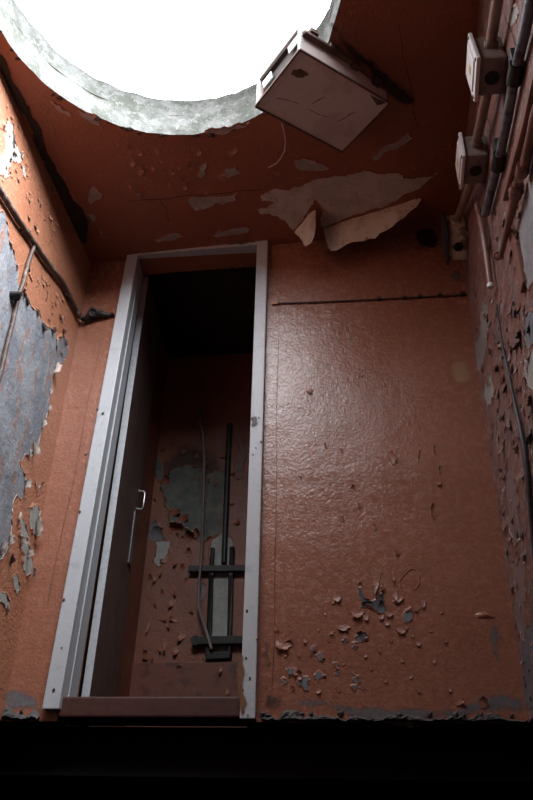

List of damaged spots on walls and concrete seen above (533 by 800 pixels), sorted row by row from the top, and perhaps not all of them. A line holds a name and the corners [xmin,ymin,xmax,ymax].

peeling [0,104,53,207]
peeling [187,191,239,212]
peeling [256,131,438,251]
peeling [509,177,533,293]
peeling [0,209,69,614]
peeling [473,288,533,492]
peeling [142,435,262,673]
spalling [1,706,40,721]
peeling [275,633,293,657]
peeling [280,639,346,694]
peeling [317,567,427,658]
spalling [259,688,528,723]